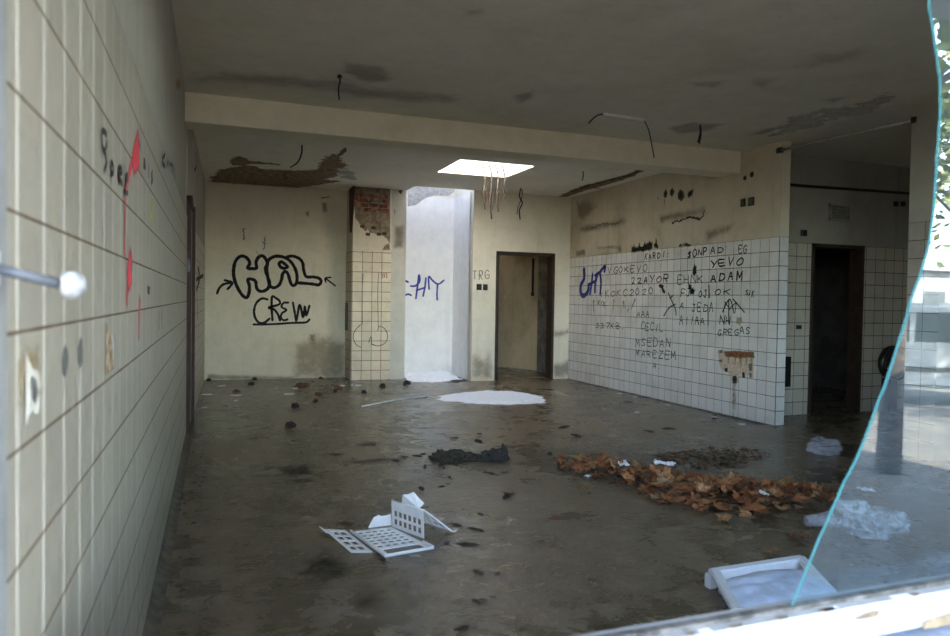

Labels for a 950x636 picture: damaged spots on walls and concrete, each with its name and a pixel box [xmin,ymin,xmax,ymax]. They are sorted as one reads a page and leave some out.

flaking render [209,148,454,250]